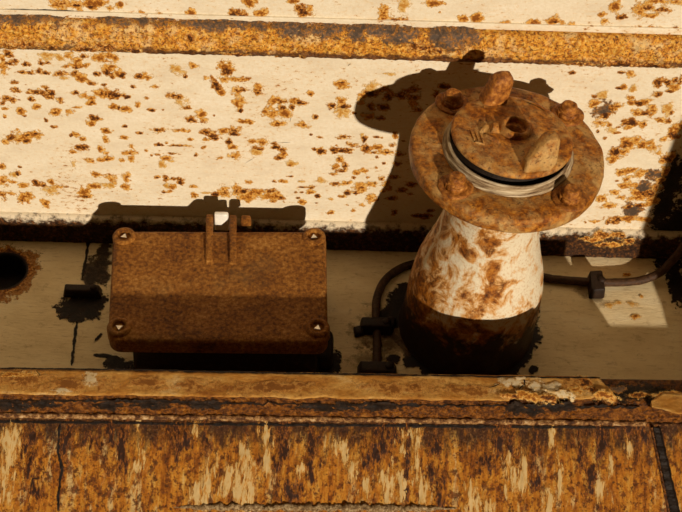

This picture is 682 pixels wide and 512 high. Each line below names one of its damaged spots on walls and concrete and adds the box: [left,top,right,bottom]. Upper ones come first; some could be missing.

rust [0,0,485,55]
rust [523,13,575,25]
rust [597,0,682,27]
rust [0,38,164,129]
rust [1,128,45,145]
rust [69,52,423,212]
rust [557,58,682,248]
rust [0,164,68,209]
leakage [80,243,113,286]
peeling [495,375,561,394]
crack [56,424,64,511]
rust [0,369,657,512]